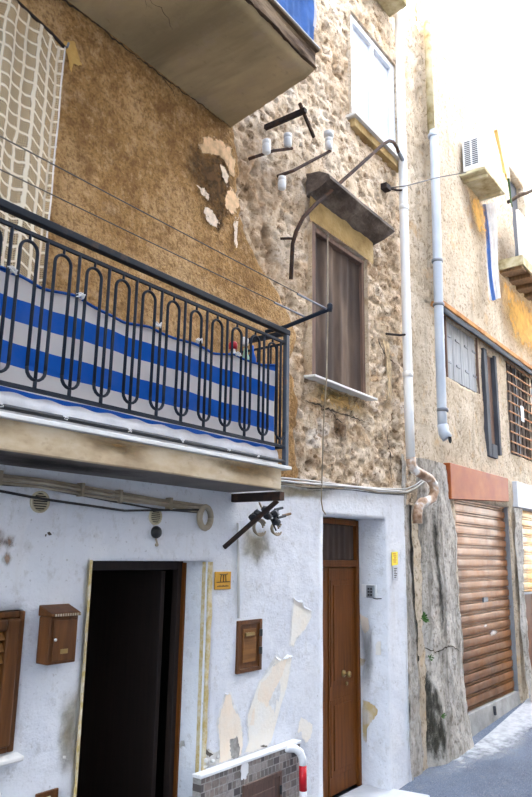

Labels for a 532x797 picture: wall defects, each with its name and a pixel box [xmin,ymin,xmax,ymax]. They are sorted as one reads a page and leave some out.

peeling [197,136,240,248]
water stain [434,521,444,621]
peeling [195,562,312,780]
peeling [362,700,378,742]
water stain [425,674,447,756]